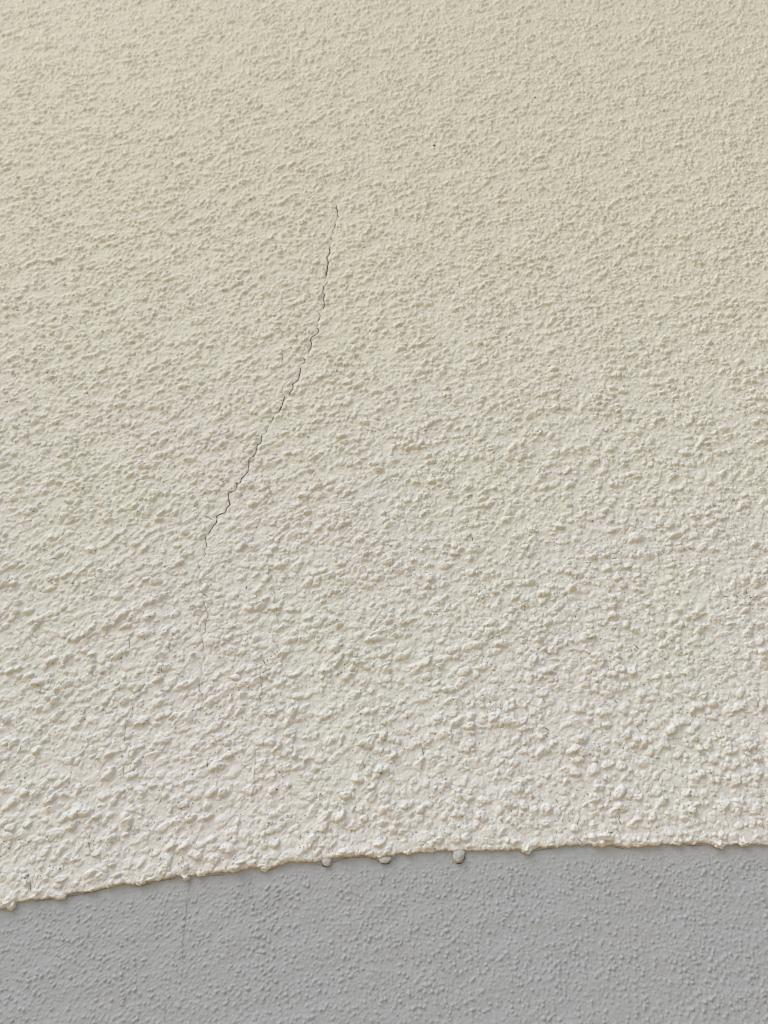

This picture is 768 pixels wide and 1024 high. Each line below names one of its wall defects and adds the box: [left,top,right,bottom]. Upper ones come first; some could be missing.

crack [198,205,338,648]